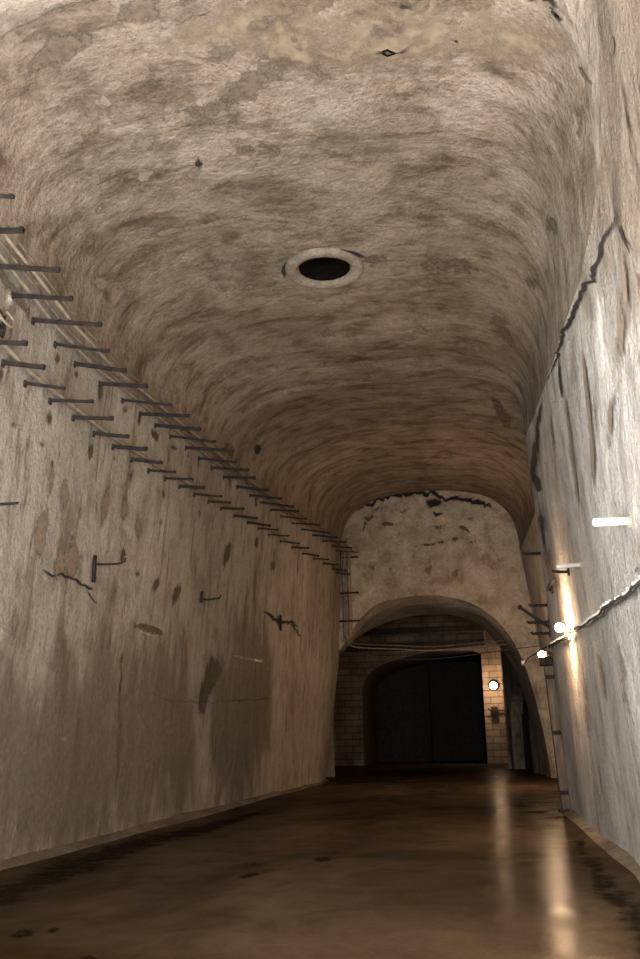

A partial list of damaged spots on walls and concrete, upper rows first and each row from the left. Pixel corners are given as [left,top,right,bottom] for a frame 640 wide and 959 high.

crack [530,0,561,21]
crack [534,197,630,417]
crack [358,491,491,510]
water stain [0,614,272,850]